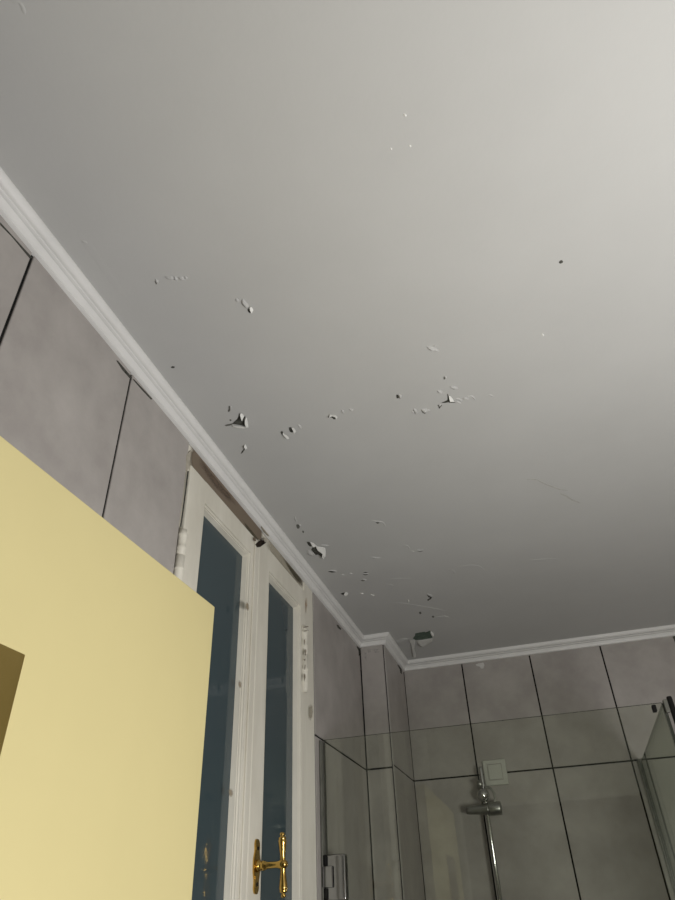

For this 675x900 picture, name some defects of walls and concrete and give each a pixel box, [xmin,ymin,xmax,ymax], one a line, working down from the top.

peeling [225,406,249,429]
peeling [294,516,330,559]
peeling [409,631,434,658]